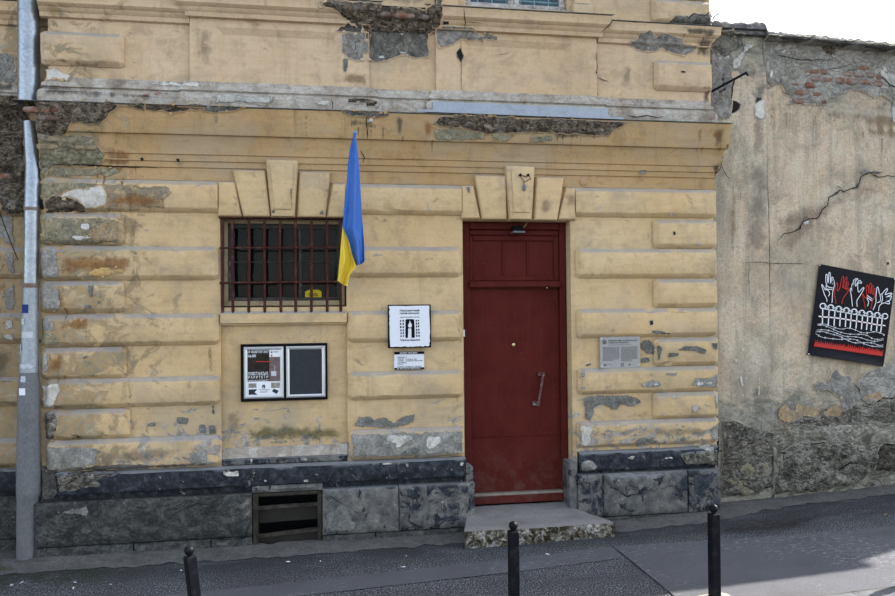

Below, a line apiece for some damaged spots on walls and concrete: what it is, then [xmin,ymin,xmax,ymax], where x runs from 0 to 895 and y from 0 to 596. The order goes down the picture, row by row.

flaking render [318,0,498,72]
flaking render [629,12,712,57]
flaking render [710,28,895,122]
flaking render [432,113,629,143]
flaking render [0,52,271,341]
crack [748,169,894,289]
peeling [641,330,718,363]
peeling [351,414,464,467]
peeling [579,363,641,446]
flaking render [665,360,895,500]